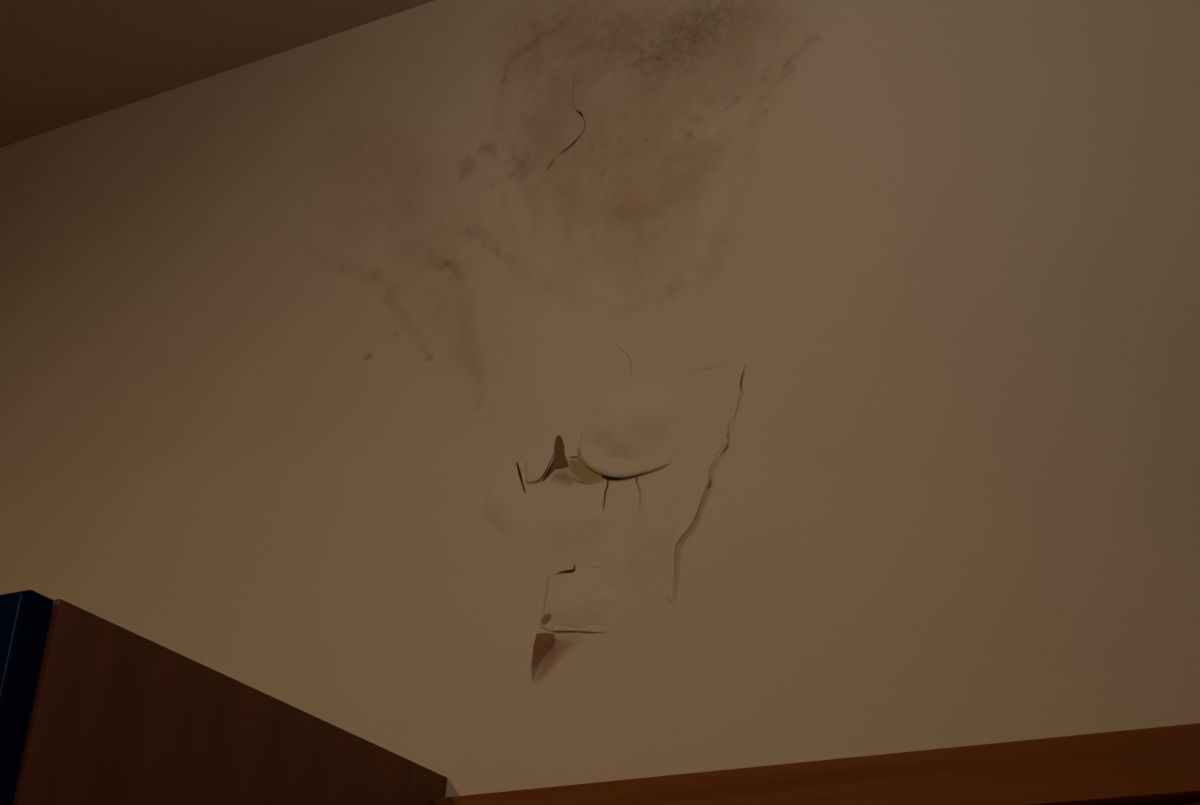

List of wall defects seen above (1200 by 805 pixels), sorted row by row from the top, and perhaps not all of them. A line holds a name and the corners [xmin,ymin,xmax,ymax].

peeling [525,435,673,483]
peeling [525,615,608,681]